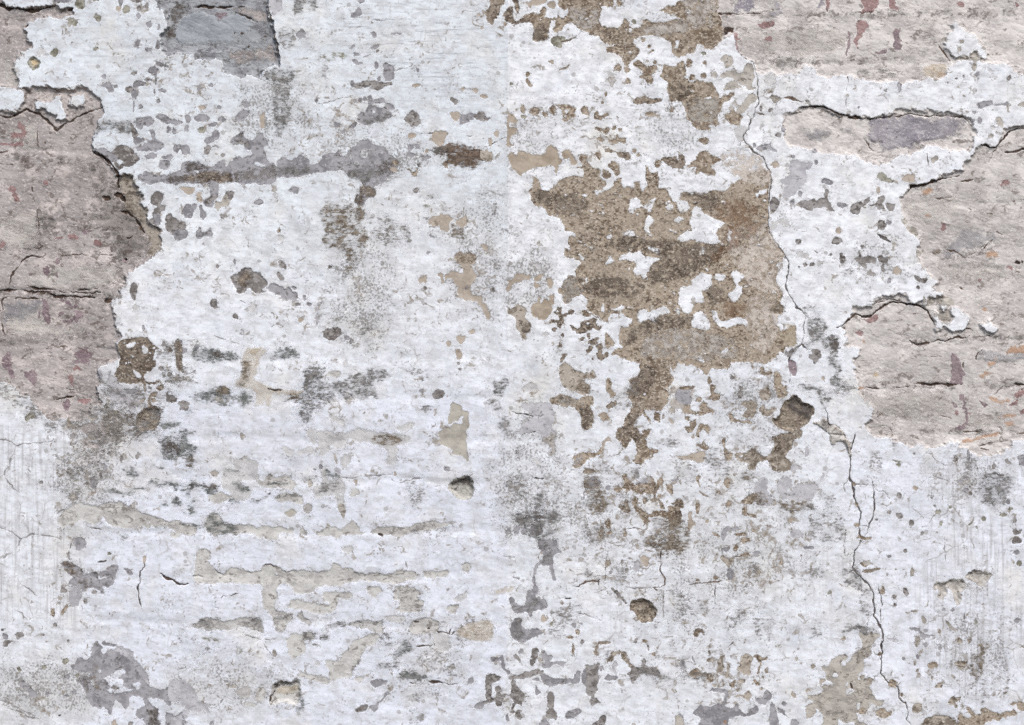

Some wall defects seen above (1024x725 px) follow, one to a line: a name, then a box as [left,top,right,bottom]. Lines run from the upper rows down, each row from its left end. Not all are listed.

crack [2,103,103,161]
crack [0,152,145,333]
spalling [0,0,456,553]
spalling [418,0,1024,580]
crack [743,57,972,383]
crack [977,128,1024,153]
crack [836,299,1009,483]
peeling [447,591,467,614]
crack [825,408,910,723]
peeling [860,555,909,607]